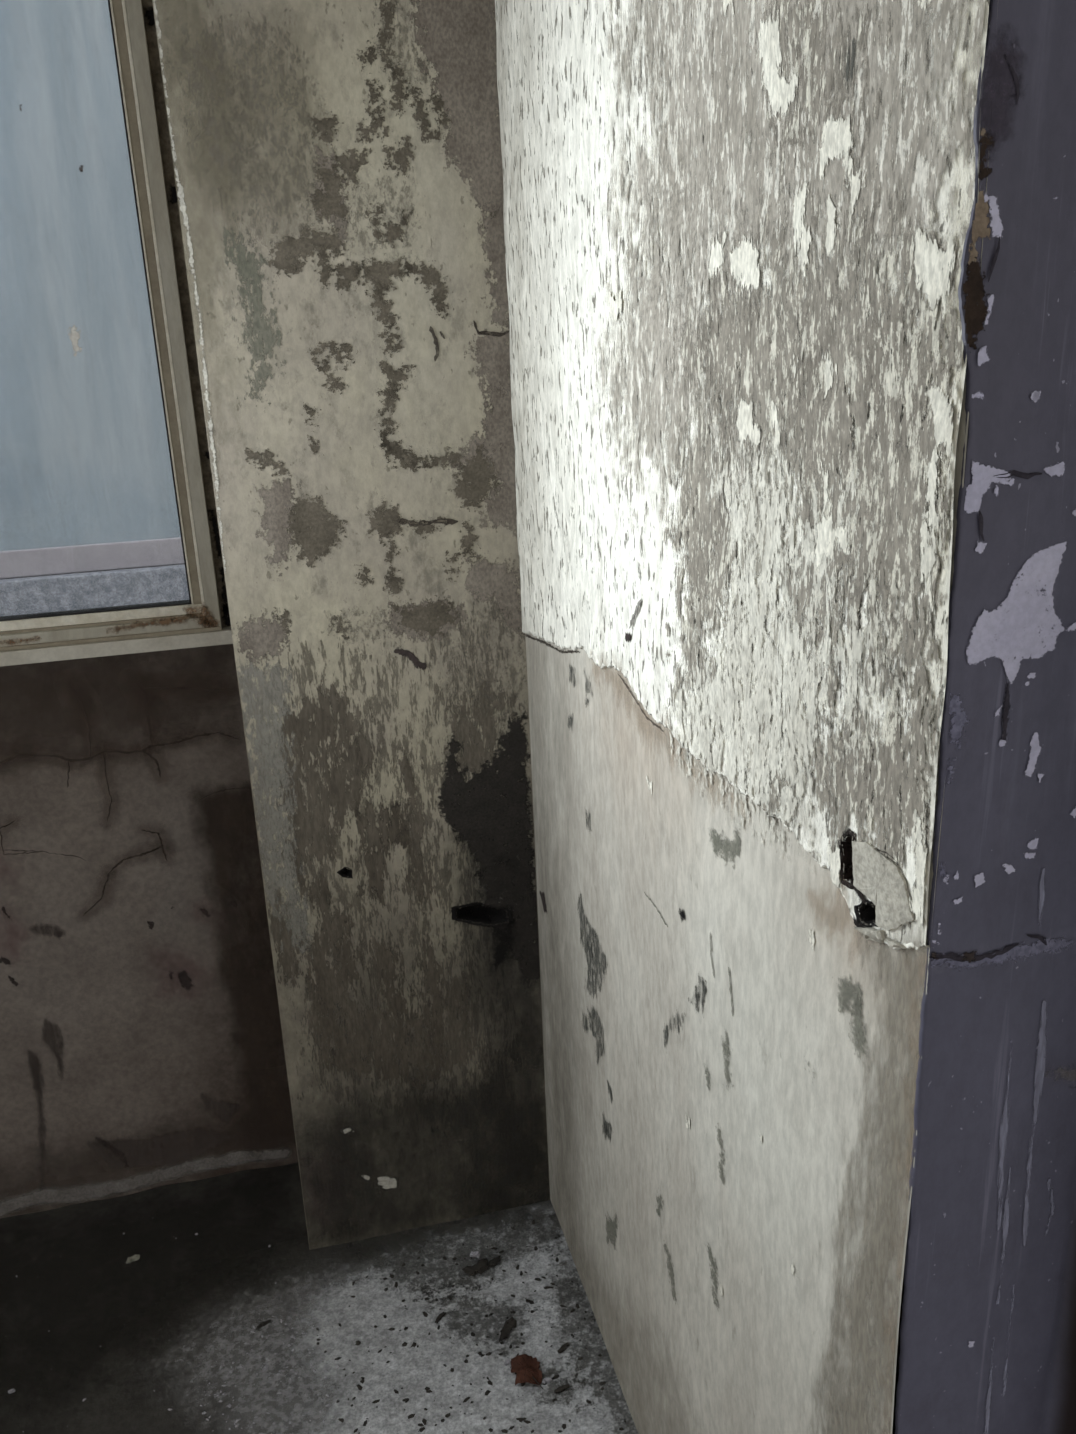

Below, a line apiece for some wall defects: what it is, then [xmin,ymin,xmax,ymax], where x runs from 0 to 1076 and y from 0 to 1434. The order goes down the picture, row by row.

water stain [221,213,286,407]
peeling [583,0,1015,949]
peeling [1044,461,1065,477]
peeling [966,541,1076,747]
spalling [568,666,593,729]
crack [0,682,240,821]
peeling [1025,732,1044,783]
crack [0,821,167,916]
peeling [1003,838,1039,874]
water stain [195,676,550,1243]
crack [929,934,1074,969]